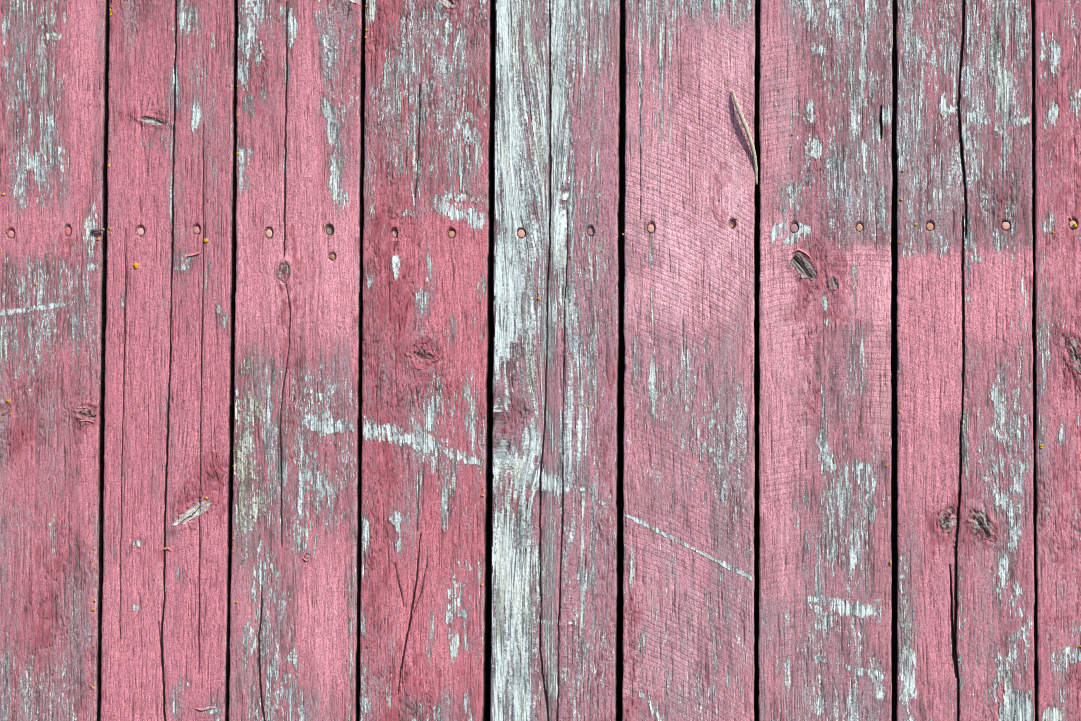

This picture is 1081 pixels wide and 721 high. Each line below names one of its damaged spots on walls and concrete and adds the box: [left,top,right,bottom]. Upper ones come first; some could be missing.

peeling [2,0,71,209]
crack [143,0,204,721]
peeling [234,355,353,721]
peeling [392,255,401,280]
crack [395,534,427,693]
peeling [382,2,481,206]
peeling [411,370,478,540]
peeling [426,0,753,721]
peeling [791,0,1023,320]
crack [942,0,991,721]
peeling [962,252,1065,721]
peeling [1039,25,1061,81]